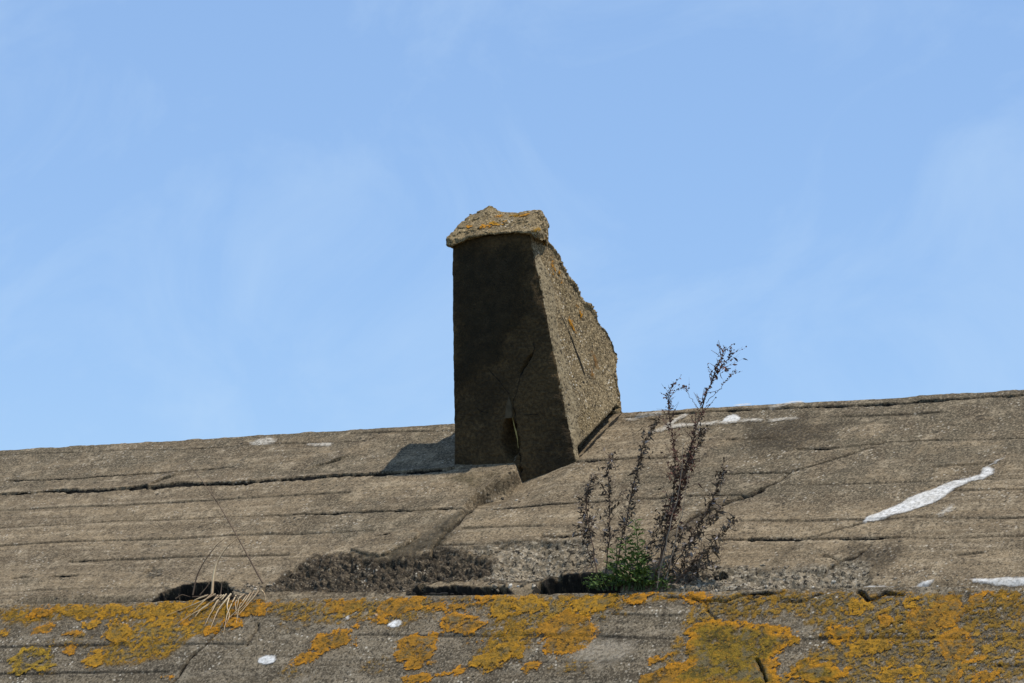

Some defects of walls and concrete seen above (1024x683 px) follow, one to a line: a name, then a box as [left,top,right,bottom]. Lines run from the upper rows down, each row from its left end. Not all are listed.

crack [477,344,538,474]
crack [14,463,445,495]
leakage [864,460,998,522]
spalling [268,528,598,595]
crack [749,536,803,544]
crack [830,538,889,570]